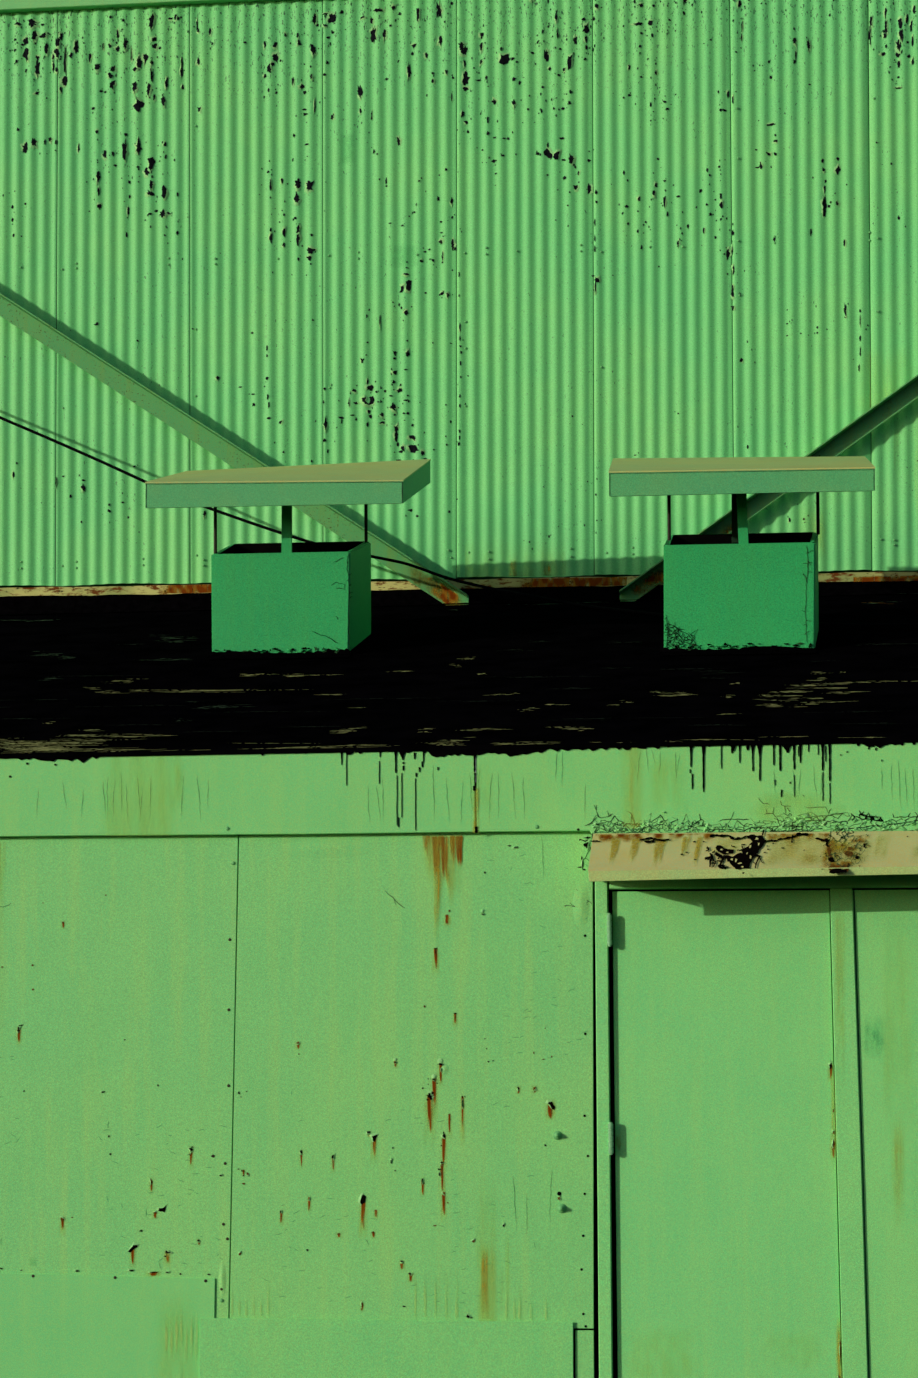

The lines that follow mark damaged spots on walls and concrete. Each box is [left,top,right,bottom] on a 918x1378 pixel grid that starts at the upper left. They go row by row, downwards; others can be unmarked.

peeling [0,6,223,244]
peeling [259,160,317,276]
peeling [243,0,604,186]
peeling [536,137,629,206]
peeling [311,323,469,462]
corrosion [166,585,212,593]
corrosion [413,571,458,605]
corrosion [514,566,664,592]
water stain [86,674,541,830]
water stain [638,668,916,802]
corrosion [425,788,478,904]
peeling [578,811,918,874]